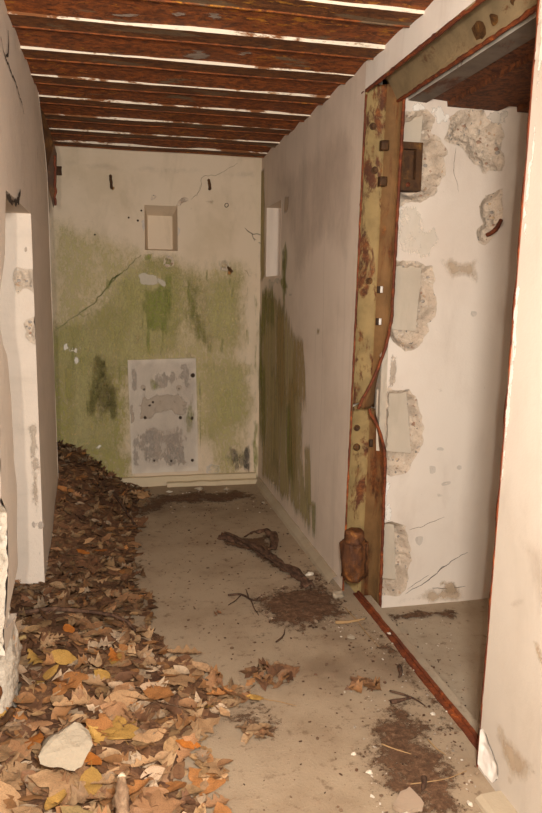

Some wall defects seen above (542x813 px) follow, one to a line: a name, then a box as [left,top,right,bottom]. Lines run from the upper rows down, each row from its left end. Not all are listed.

crack [1,34,24,112]
spalling [390,103,507,351]
peeling [523,127,535,240]
crack [57,255,141,329]
peeling [130,373,187,423]
peeling [138,427,184,463]
water stain [258,262,315,533]
spalling [376,388,424,596]
spalling [0,476,27,726]
crack [407,553,466,593]